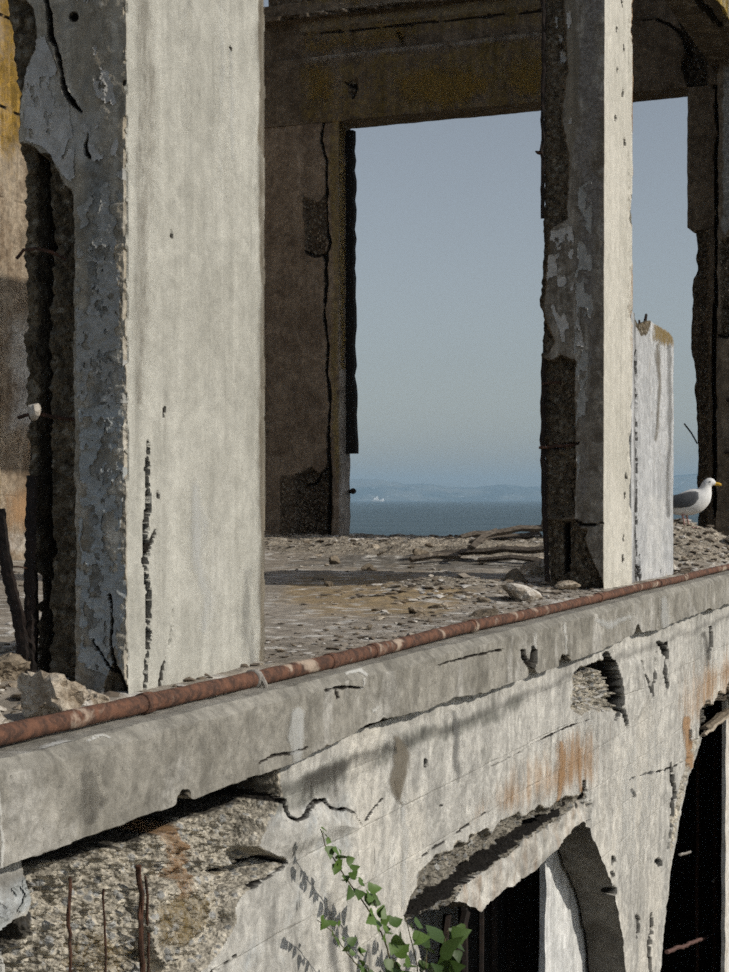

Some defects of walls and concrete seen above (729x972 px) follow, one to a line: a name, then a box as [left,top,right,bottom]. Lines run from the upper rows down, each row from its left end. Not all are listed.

crack [43,0,91,159]
crack [694,0,724,28]
spalling [8,0,128,693]
crack [304,123,333,535]
spalling [535,0,604,589]
crack [92,441,166,691]
spalling [0,768,287,972]
crack [259,746,308,764]
crack [208,787,384,823]
spalling [404,793,593,928]
corrosion [547,742,582,803]
spalling [559,653,616,716]